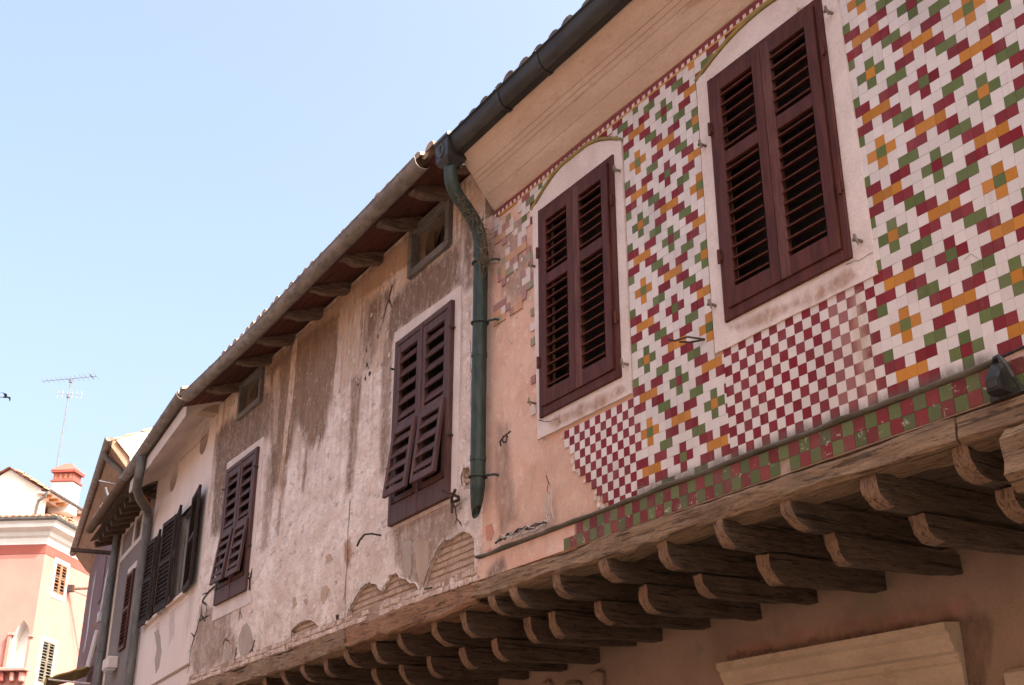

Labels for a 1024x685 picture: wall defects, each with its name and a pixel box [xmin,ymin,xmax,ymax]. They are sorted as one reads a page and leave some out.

damp [212,224,472,533]
spalling [335,530,476,622]